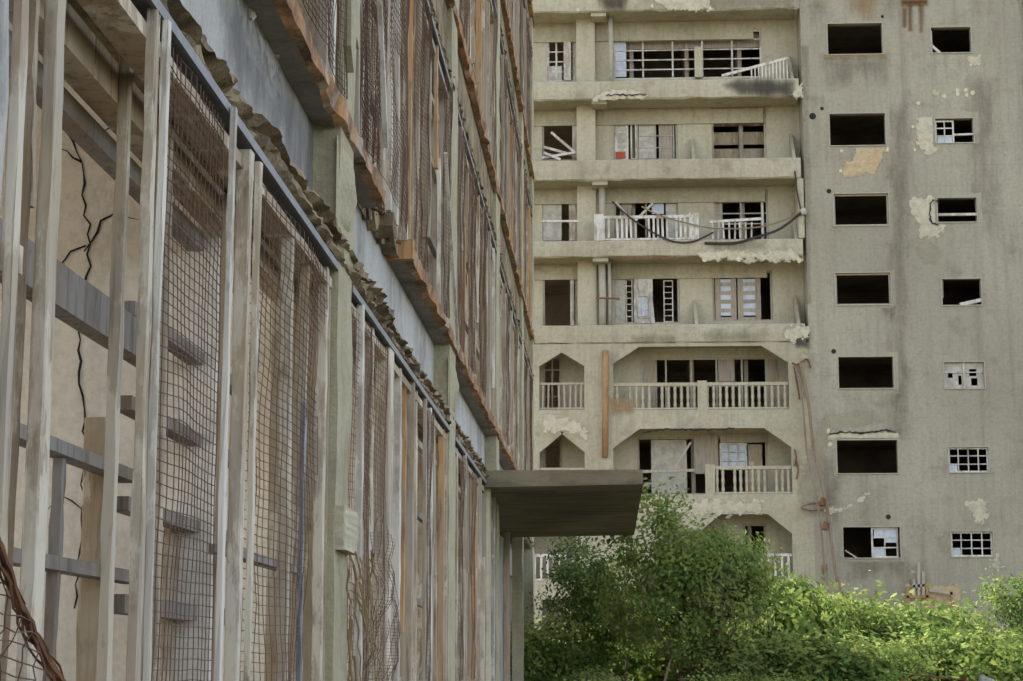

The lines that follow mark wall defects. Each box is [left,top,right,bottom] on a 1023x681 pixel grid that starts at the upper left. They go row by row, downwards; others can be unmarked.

spalling [592,89,648,102]
spalling [912,101,939,155]
spalling [839,147,889,178]
crack [62,137,138,281]
spalling [908,194,947,239]
spalling [696,248,804,263]
crack [77,332,86,435]
spalling [543,414,589,442]
spalling [964,497,990,525]
crack [48,471,83,609]